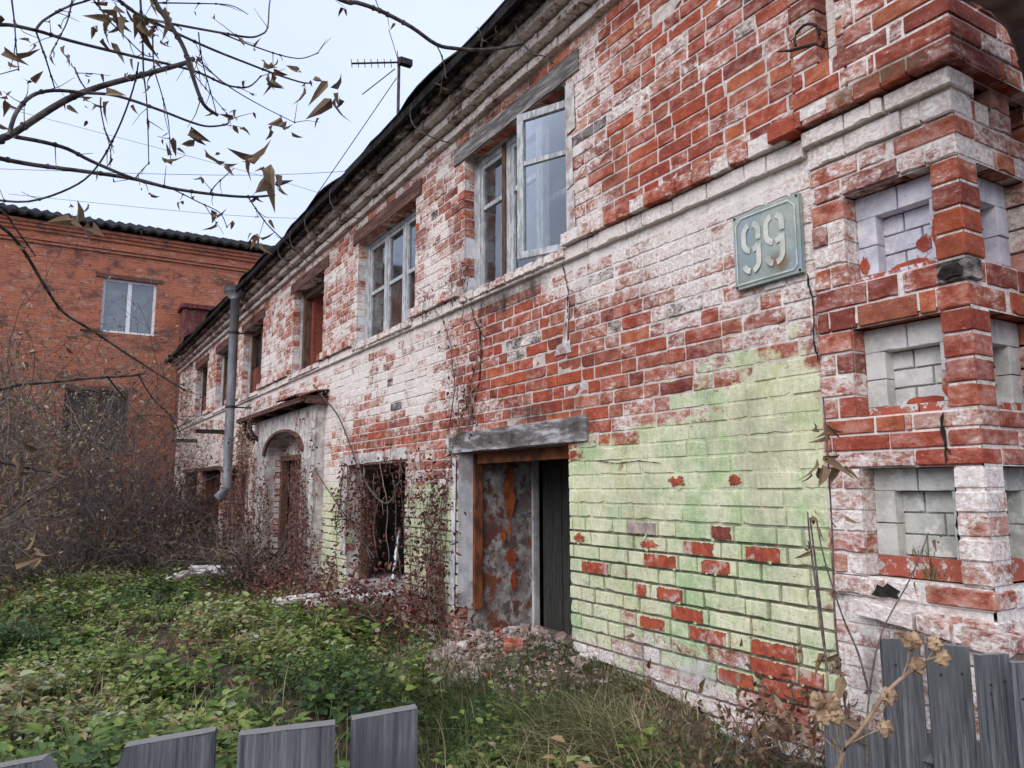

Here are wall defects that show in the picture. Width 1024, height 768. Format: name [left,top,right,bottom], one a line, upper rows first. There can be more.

crack [806,272,820,362]
crack [940,412,951,464]
peeling [626,521,731,576]
peeling [745,546,780,564]
peeling [635,582,726,647]
hole [871,583,901,600]
spalling [351,628,640,767]
peeling [717,639,825,704]